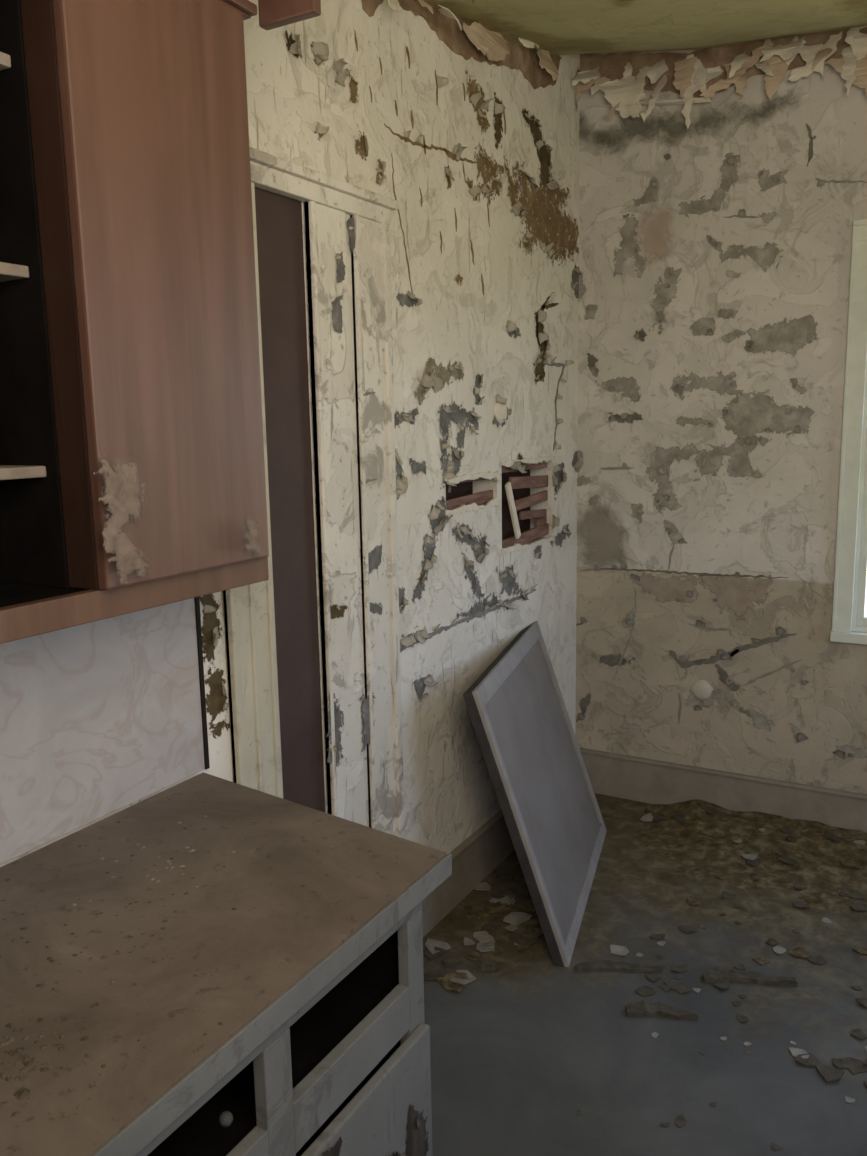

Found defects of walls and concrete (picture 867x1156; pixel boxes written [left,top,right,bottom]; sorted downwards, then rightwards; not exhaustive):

peeling [285,30,372,106]
peeling [352,132,387,186]
crack [384,123,479,294]
peeling [435,70,598,320]
peeling [332,217,355,333]
peeling [533,313,551,384]
peeling [587,353,642,424]
peeling [690,309,818,357]
flaking render [394,356,600,650]
peeling [591,370,814,680]
peeling [199,594,230,739]
crack [669,620,802,725]